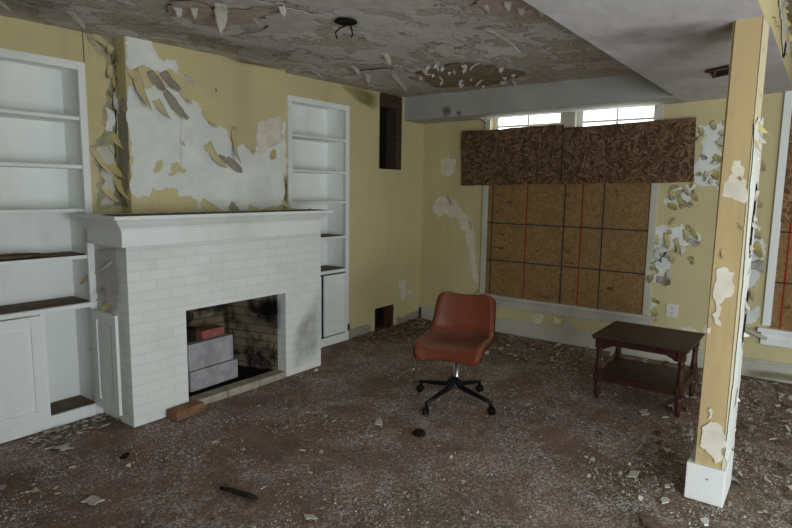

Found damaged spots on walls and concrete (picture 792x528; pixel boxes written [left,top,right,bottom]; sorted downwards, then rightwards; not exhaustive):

peeling [165,1,289,36]
peeling [472,0,555,24]
peeling [779,0,792,58]
peeling [348,52,527,95]
peeling [63,11,292,212]
peeling [433,195,479,292]
peeling [647,117,769,464]